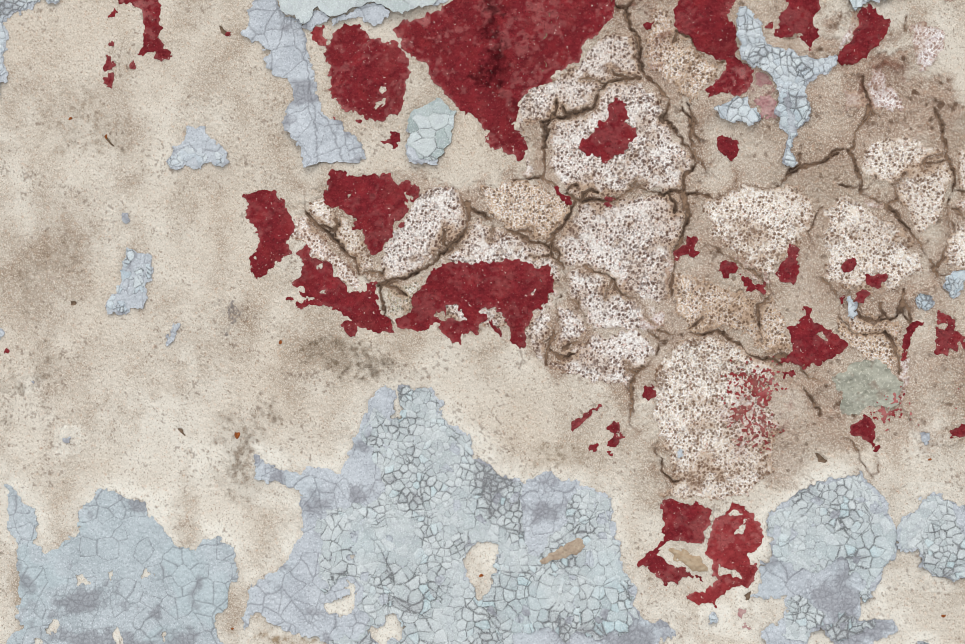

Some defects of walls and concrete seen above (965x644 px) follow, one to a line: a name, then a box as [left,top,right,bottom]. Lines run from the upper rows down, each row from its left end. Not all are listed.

peeling [0,0,60,95]
peeling [240,0,448,168]
crack [672,30,725,64]
crack [305,0,711,366]
spalling [291,0,965,501]
crack [626,247,821,417]
crack [821,277,912,382]
crack [781,76,965,277]
peeling [4,484,239,644]
peeling [241,384,676,644]
crack [654,450,679,483]
peeling [742,471,965,644]